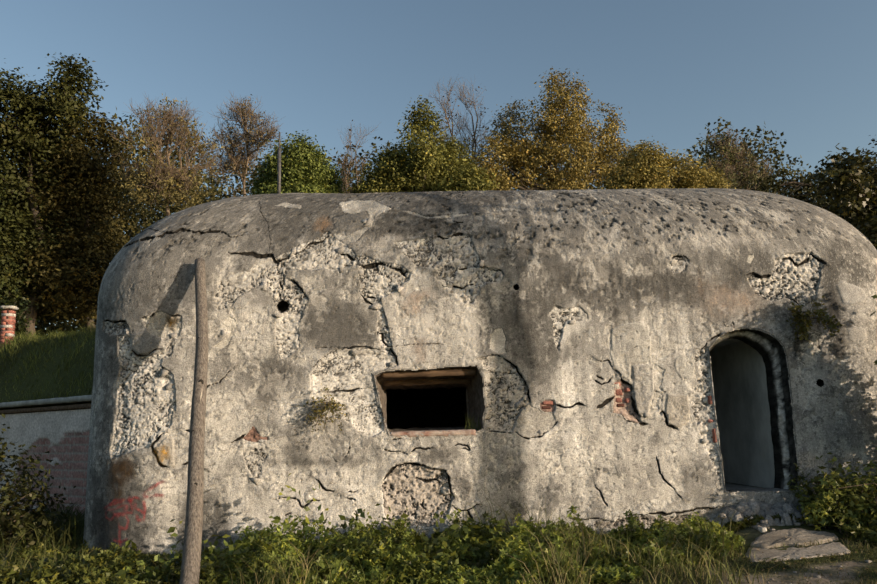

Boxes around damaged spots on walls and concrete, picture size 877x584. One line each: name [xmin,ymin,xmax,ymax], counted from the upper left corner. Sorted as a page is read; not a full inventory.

crack [125,196,329,295]
flaking render [211,200,503,436]
crack [341,254,406,277]
flaking render [747,254,824,307]
flaking render [104,312,182,467]
flaking render [479,328,555,439]
flaking render [382,463,452,527]
crack [574,455,717,521]